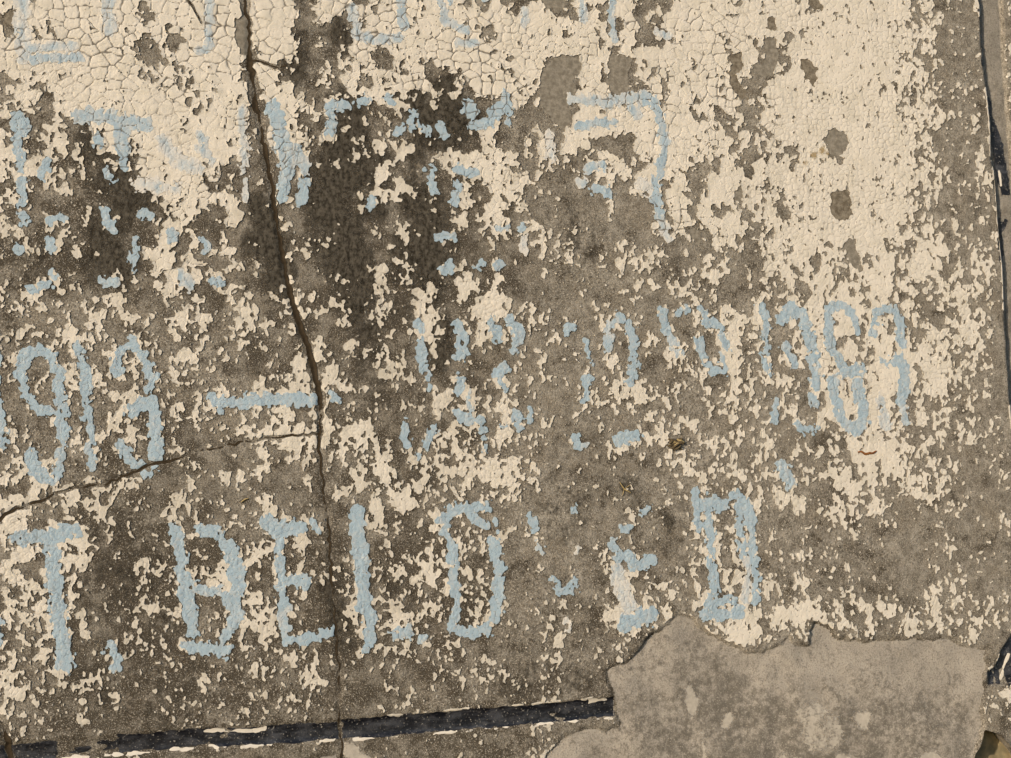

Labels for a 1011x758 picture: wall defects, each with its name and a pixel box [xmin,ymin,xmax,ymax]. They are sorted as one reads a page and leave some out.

peeling [265,185,340,262]
peeling [385,215,421,246]
crack [0,0,341,685]
peeling [592,300,643,345]
peeling [624,477,673,540]
peeling [0,415,152,742]
peeling [104,555,196,688]
spalling [526,503,1011,758]
crack [0,722,13,758]
peeling [154,665,233,728]
peeling [228,685,268,726]
crack [336,713,344,758]